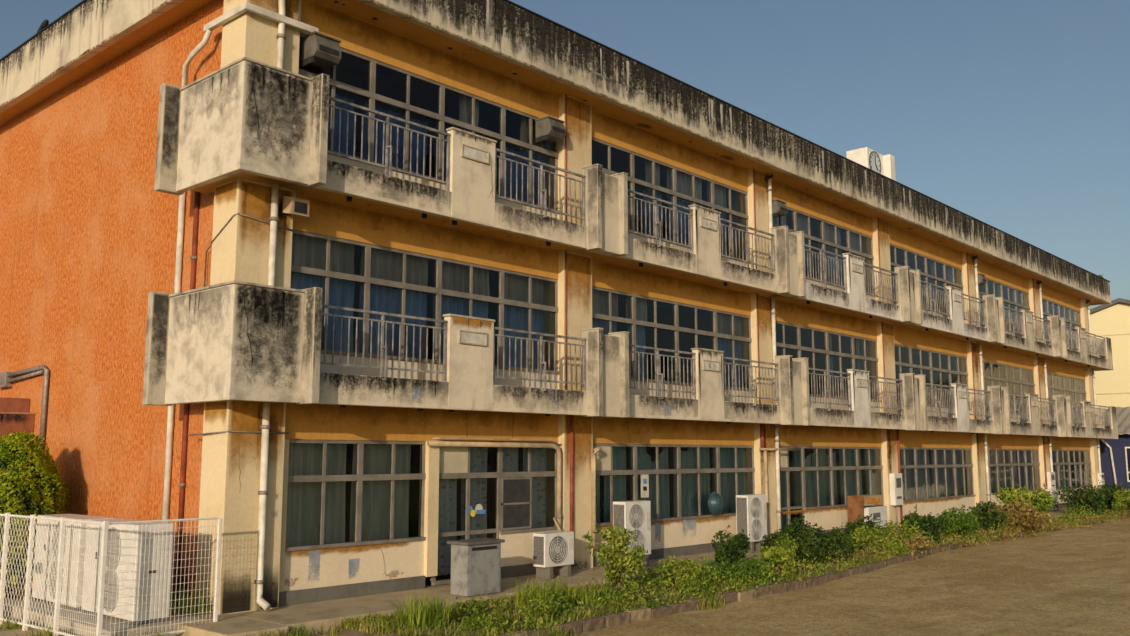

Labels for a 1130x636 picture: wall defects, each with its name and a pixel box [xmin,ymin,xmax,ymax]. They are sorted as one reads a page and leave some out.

damp [0,0,109,78]
damp [162,86,180,162]
damp [247,62,330,151]
damp [328,161,441,197]
damp [152,294,169,376]
damp [237,284,322,384]
damp [321,373,438,394]
damp [205,401,283,455]
damp [171,568,278,614]